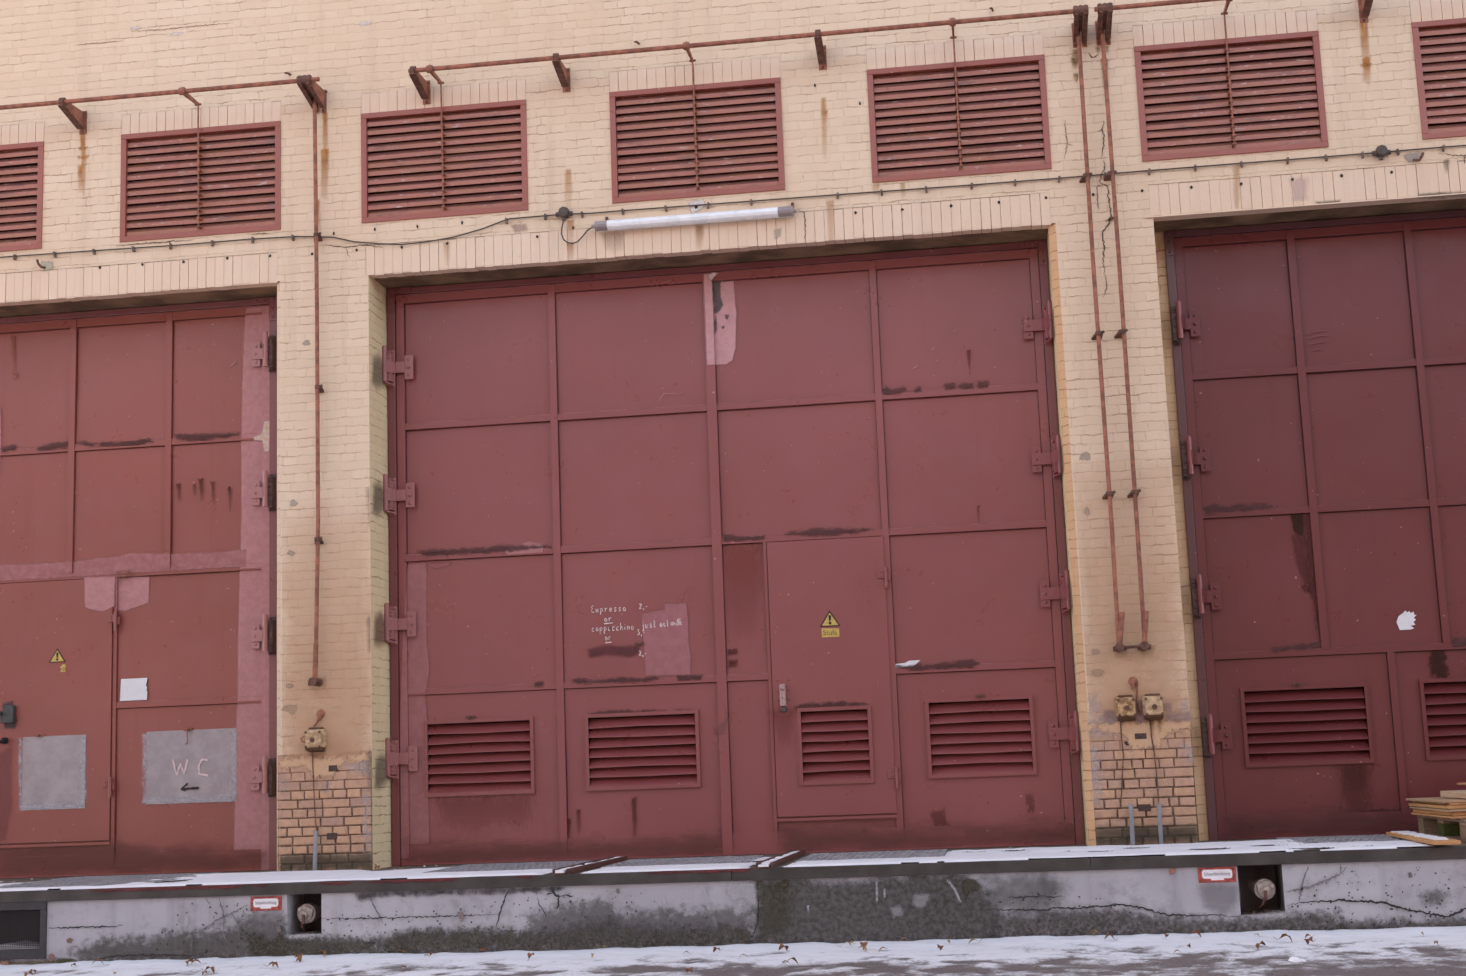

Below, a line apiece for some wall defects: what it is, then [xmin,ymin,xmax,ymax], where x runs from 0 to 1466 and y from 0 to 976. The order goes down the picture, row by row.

corrosion [1361,23,1370,70]
corrosion [78,134,88,177]
crack [1065,121,1112,297]
peeling [708,272,729,333]
crack [1286,865,1466,918]